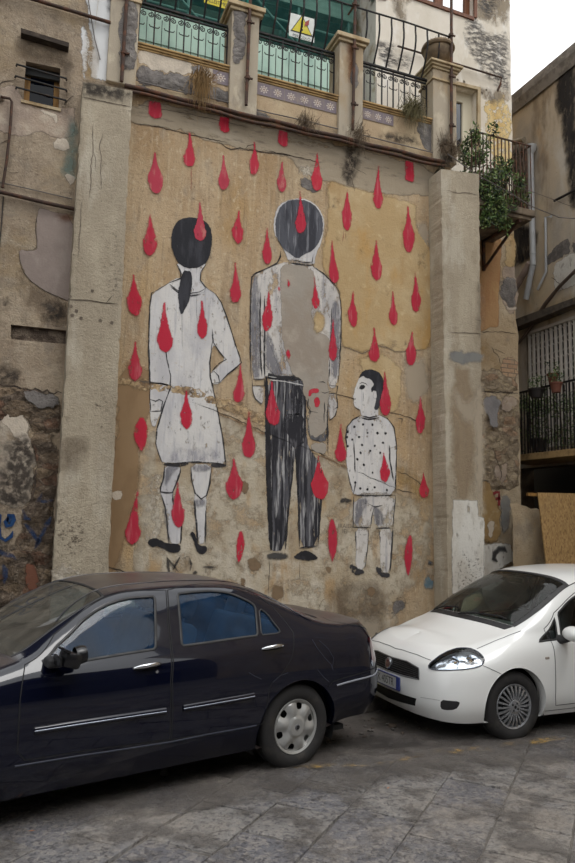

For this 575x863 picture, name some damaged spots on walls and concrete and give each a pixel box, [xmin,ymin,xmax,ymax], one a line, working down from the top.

peeling [81,27,90,77]
leakage [481,74,508,102]
crack [64,95,321,163]
peeling [484,94,512,167]
leakage [555,66,575,207]
crack [78,123,103,253]
peeling [547,239,575,292]
spalling [481,357,520,490]
spalling [0,387,84,608]